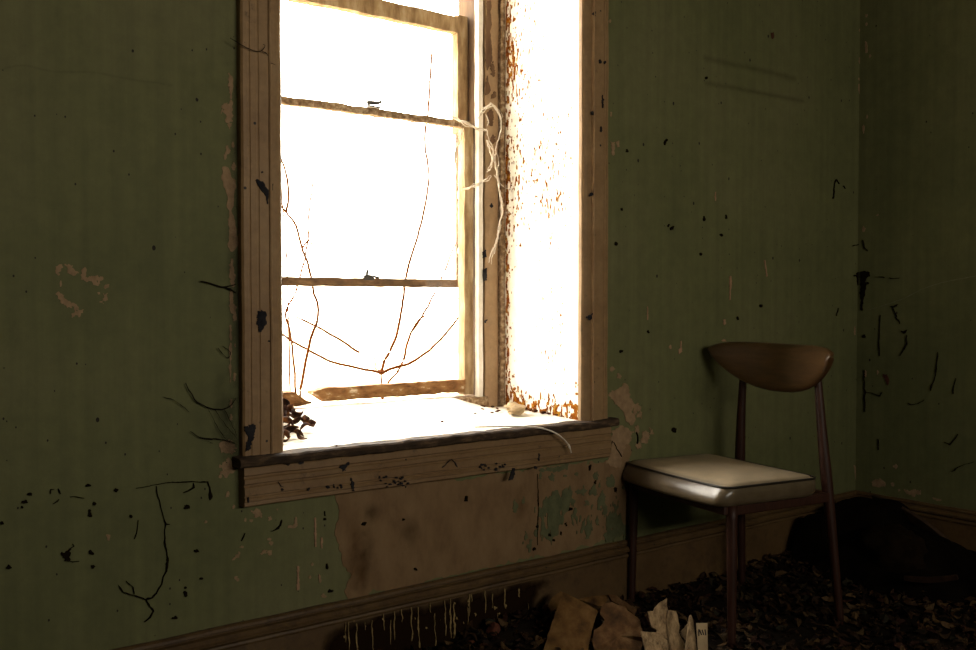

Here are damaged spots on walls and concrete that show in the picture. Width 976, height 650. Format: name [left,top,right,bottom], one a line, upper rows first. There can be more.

peeling [55,264,109,318]
peeling [485,0,578,420]
crack [118,481,213,622]
flaking render [308,366,654,599]